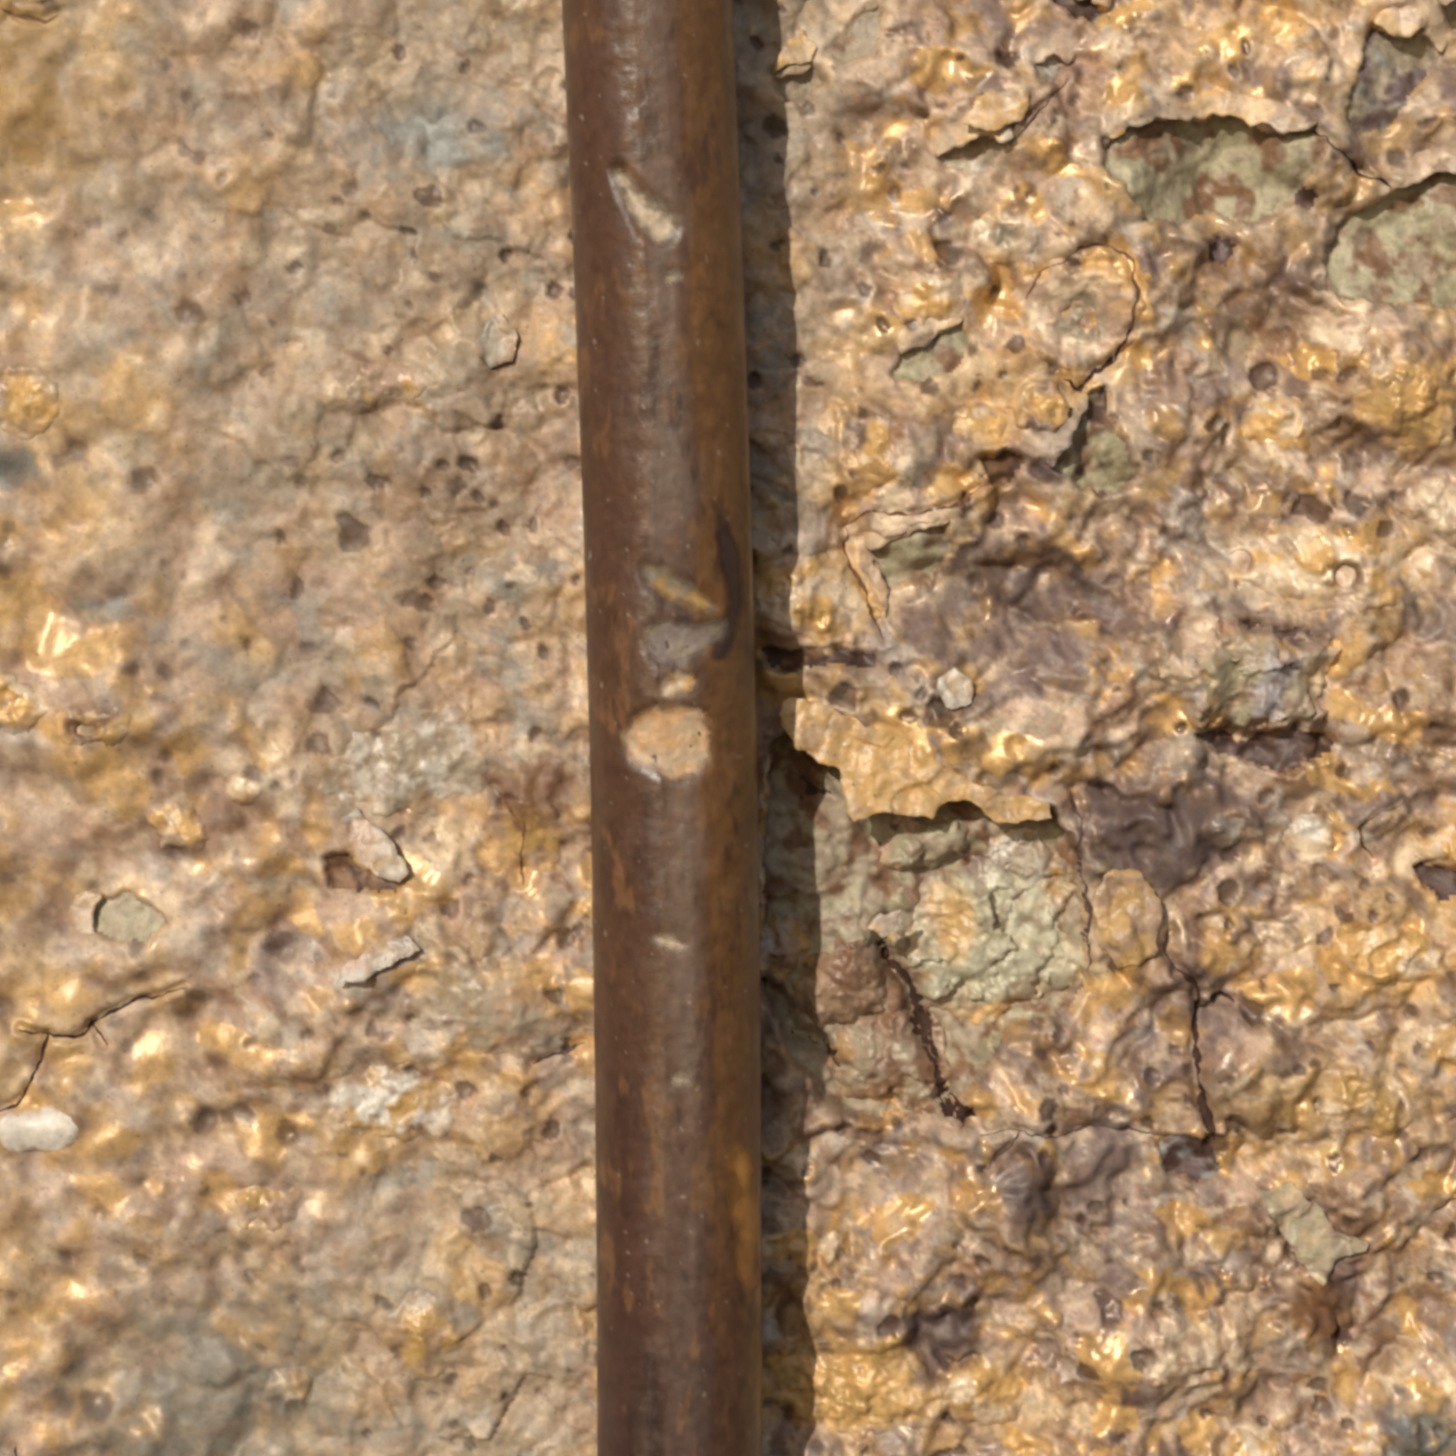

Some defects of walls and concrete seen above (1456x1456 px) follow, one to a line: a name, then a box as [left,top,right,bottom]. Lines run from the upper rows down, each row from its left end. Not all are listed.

peeling [1104,87,1324,225]
spalling [1209,236,1236,267]
peeling [1326,148,1456,310]
spalling [762,698,1163,1121]
crack [876,934,1165,1173]
crack [1162,930,1235,1140]
rust [734,1149,759,1289]